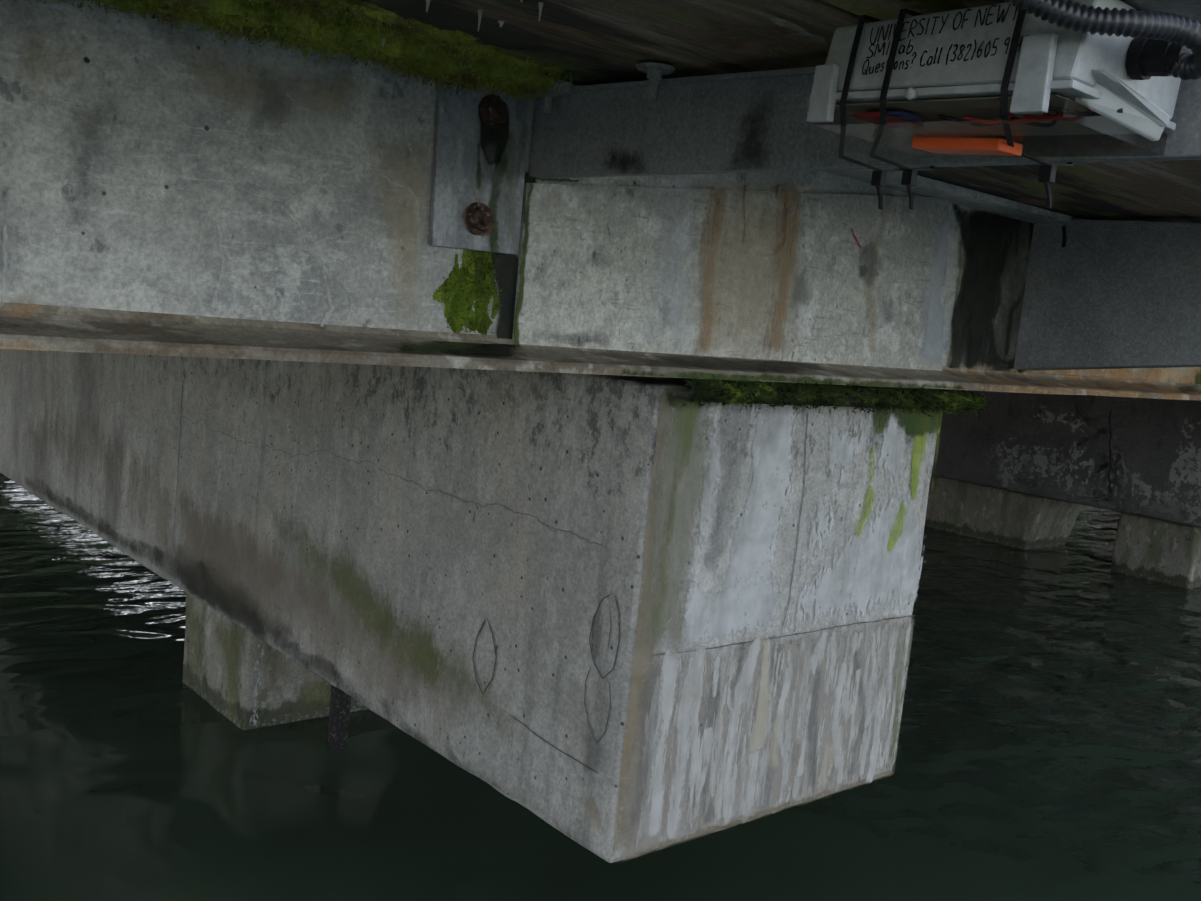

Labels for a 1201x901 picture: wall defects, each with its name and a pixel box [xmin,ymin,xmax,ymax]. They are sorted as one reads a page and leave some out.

water stain [28,482,163,565]
water stain [177,560,353,698]
water stain [614,388,941,853]